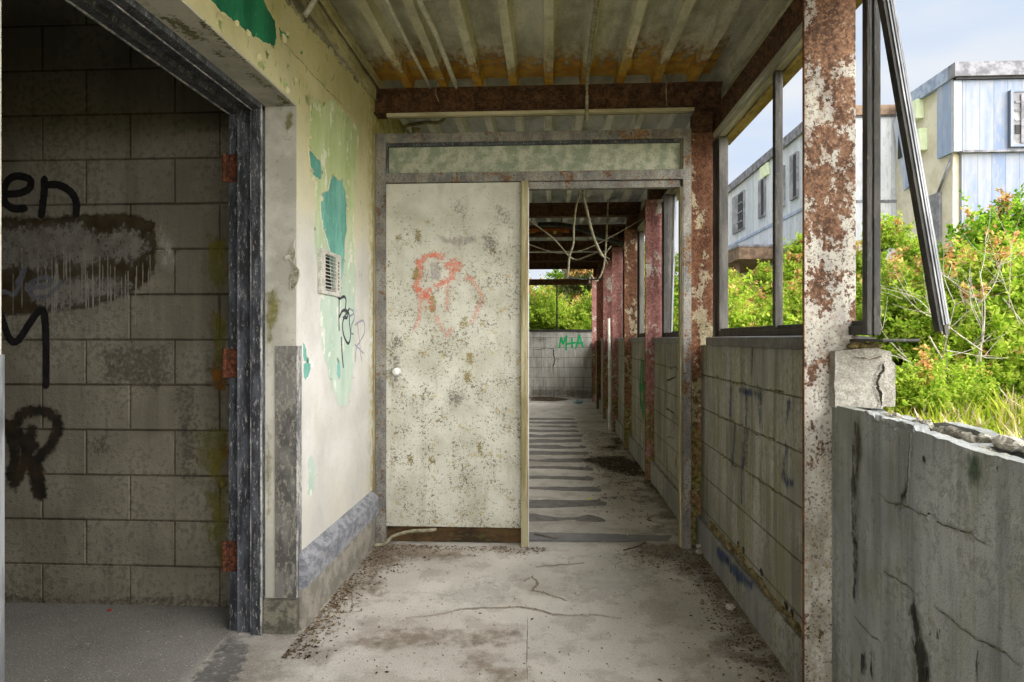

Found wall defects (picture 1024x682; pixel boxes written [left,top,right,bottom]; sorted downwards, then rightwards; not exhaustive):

peeling [210,0,370,408]
crack [854,355,887,409]
spalling [861,410,1024,455]
crack [877,493,990,547]
crack [406,562,622,619]
crack [883,570,1021,668]